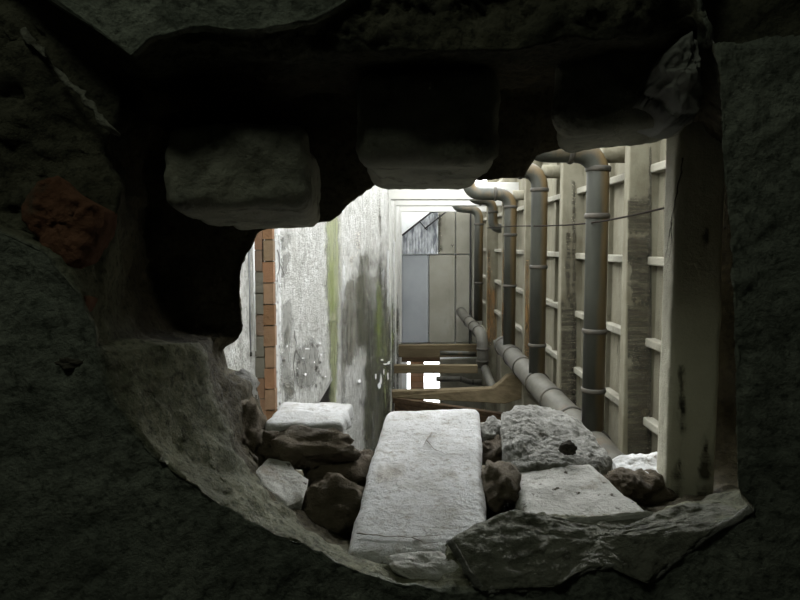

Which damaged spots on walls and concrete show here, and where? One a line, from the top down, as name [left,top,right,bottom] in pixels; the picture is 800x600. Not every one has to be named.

crack [666,158,684,257]
flaking render [275,228,333,409]
water stain [326,216,399,451]
spalling [256,458,308,509]
spalling [558,440,577,456]
spalling [385,502,754,595]